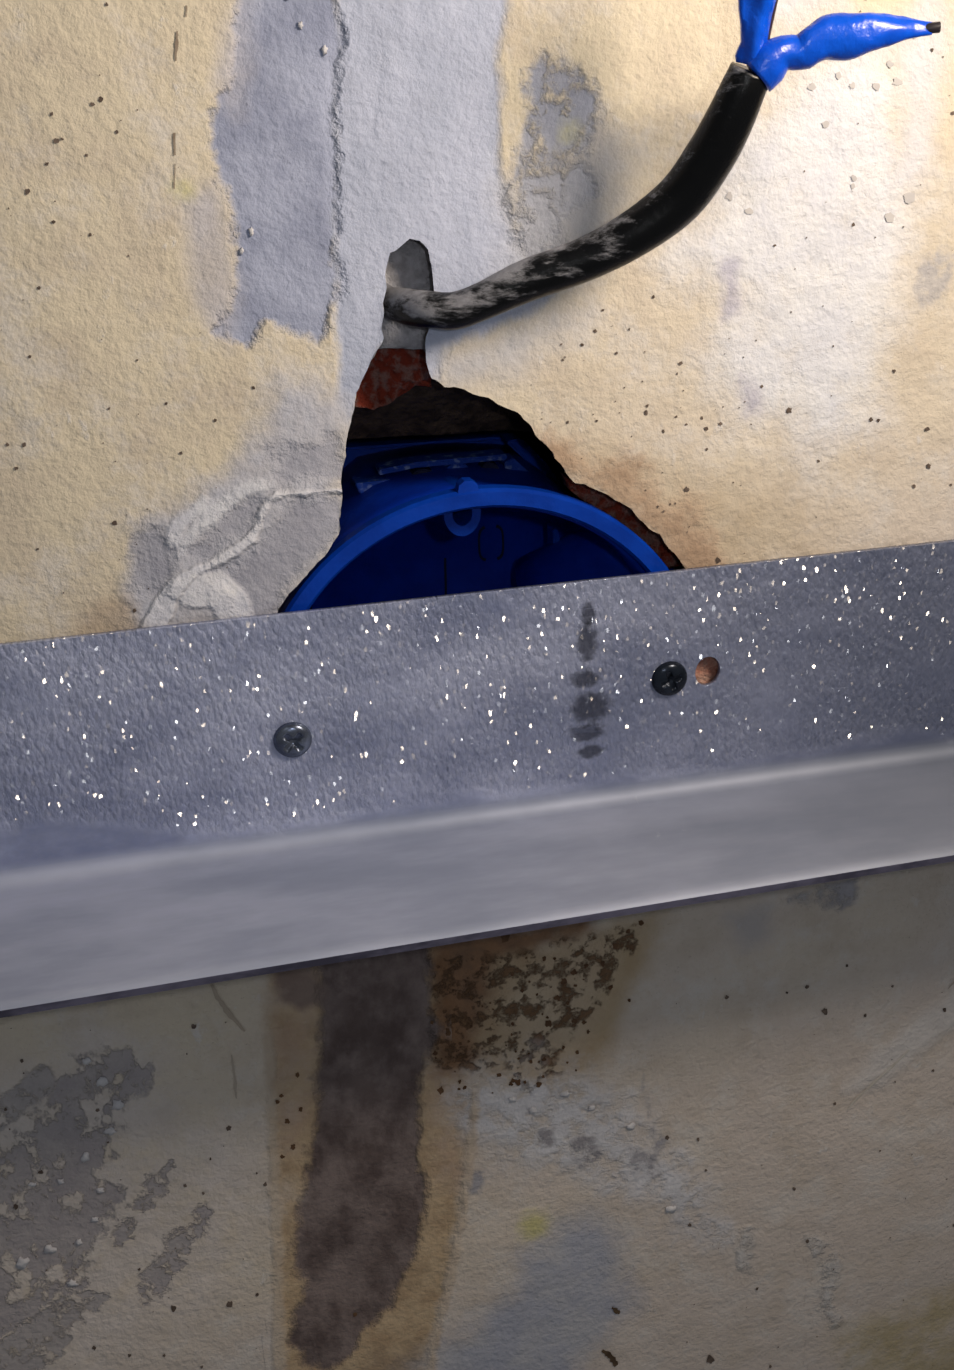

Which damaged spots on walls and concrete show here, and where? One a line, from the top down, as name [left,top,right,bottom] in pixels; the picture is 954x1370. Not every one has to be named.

peeling [153,0,370,389]
spalling [385,239,434,291]
peeling [455,20,669,287]
peeling [347,265,686,570]
spalling [695,657,718,683]
peeling [0,993,267,1370]
peeling [275,1072,326,1272]
water stain [241,945,491,1370]
spalling [492,1022,546,1094]
spalling [499,920,644,1034]